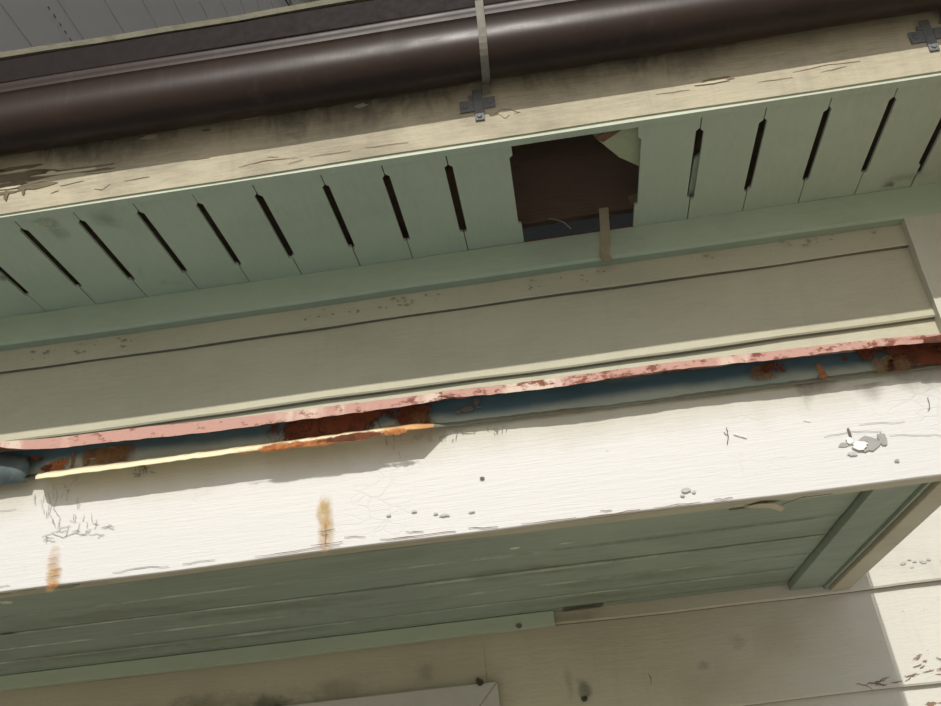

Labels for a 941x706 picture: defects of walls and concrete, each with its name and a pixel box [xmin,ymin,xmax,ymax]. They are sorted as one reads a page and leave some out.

peeling [0,163,115,200]
rust [751,362,785,380]
rust [842,335,941,373]
rust [245,404,434,453]
rust [28,445,129,471]
crack [0,475,113,542]